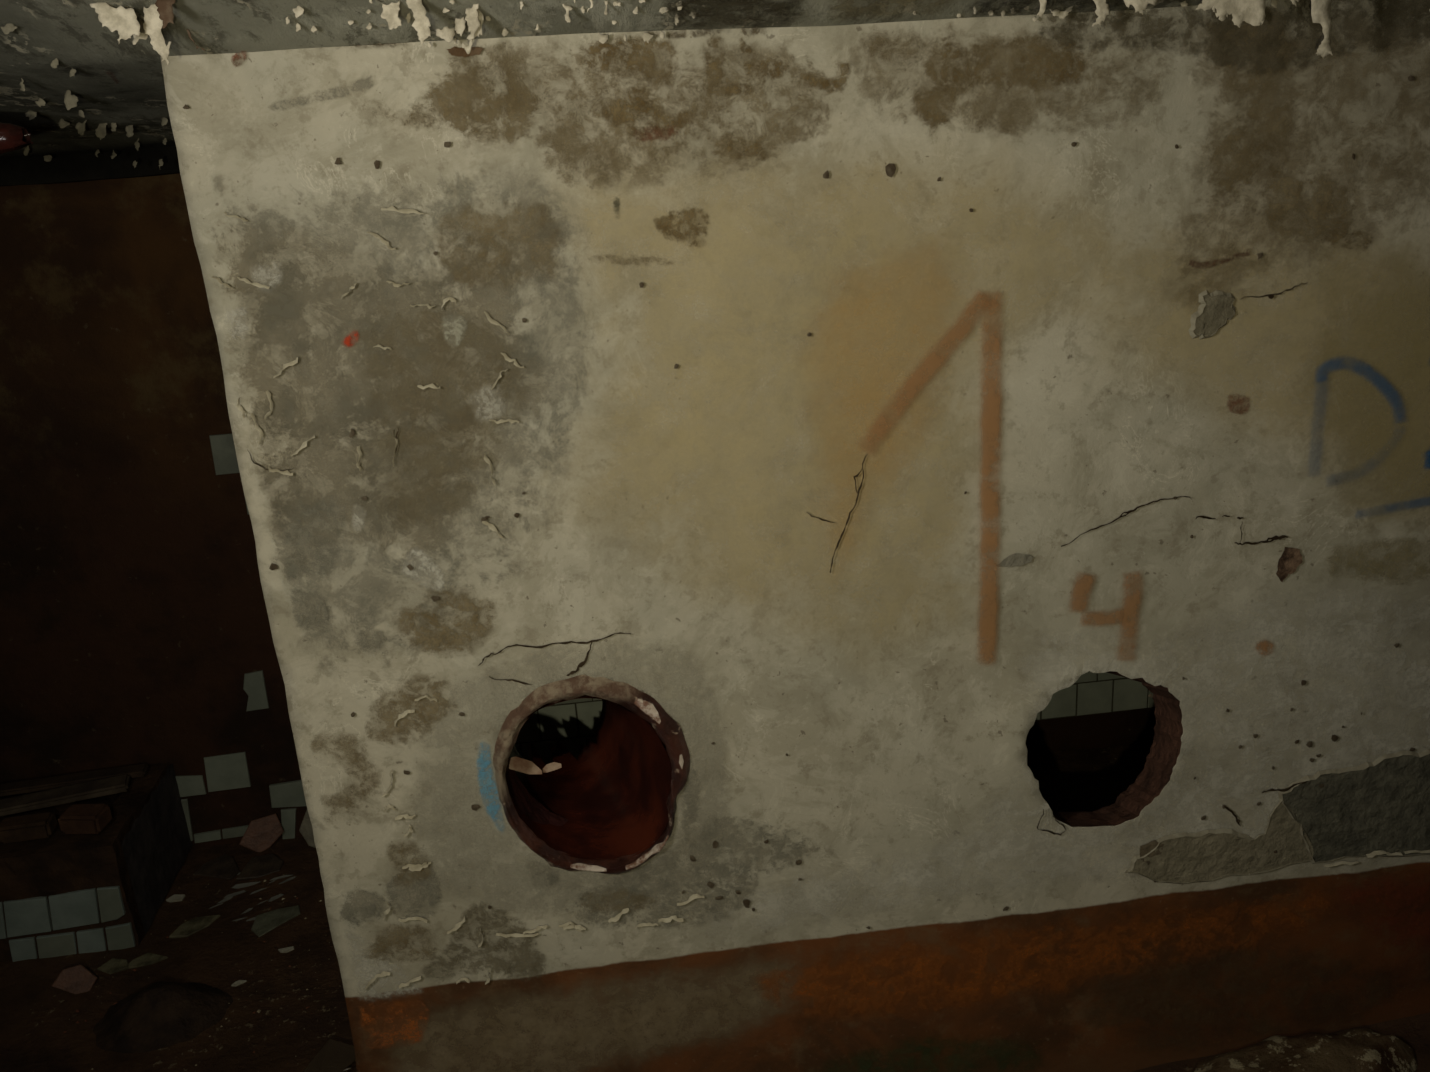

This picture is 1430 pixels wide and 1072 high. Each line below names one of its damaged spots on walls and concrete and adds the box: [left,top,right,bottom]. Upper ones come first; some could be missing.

peeling [90,0,206,66]
peeling [348,0,509,57]
peeling [1092,0,1158,29]
peeling [1181,0,1333,59]
damp [393,0,1080,632]
damp [866,0,1430,506]
damp [229,182,577,652]
crack [807,454,868,573]
crack [478,632,631,685]
damp [312,678,455,812]
flaking render [1124,740,1430,884]
damp [340,843,543,978]